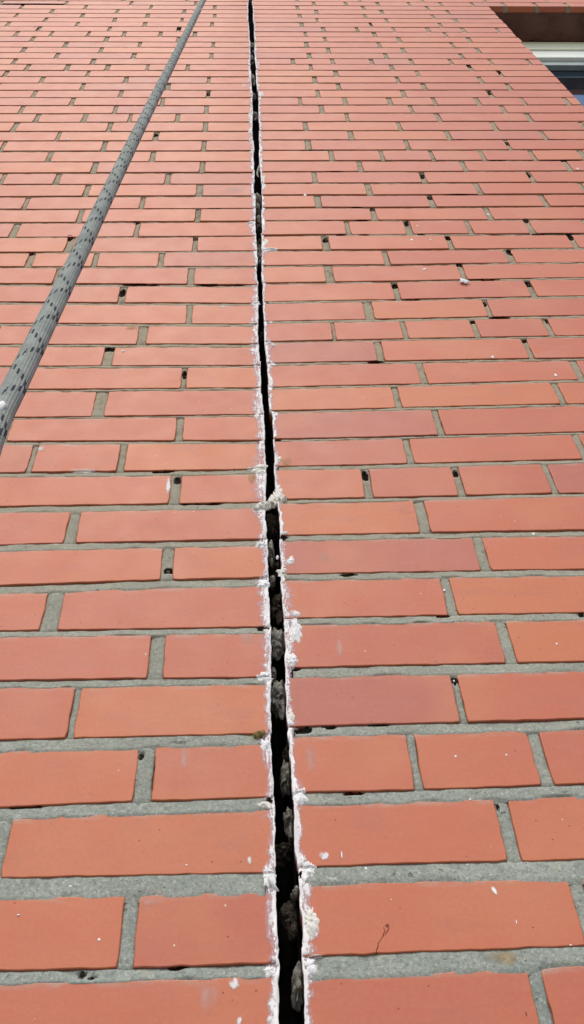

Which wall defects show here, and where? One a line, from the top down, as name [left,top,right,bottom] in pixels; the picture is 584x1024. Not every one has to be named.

crack [248,0,304,1024]